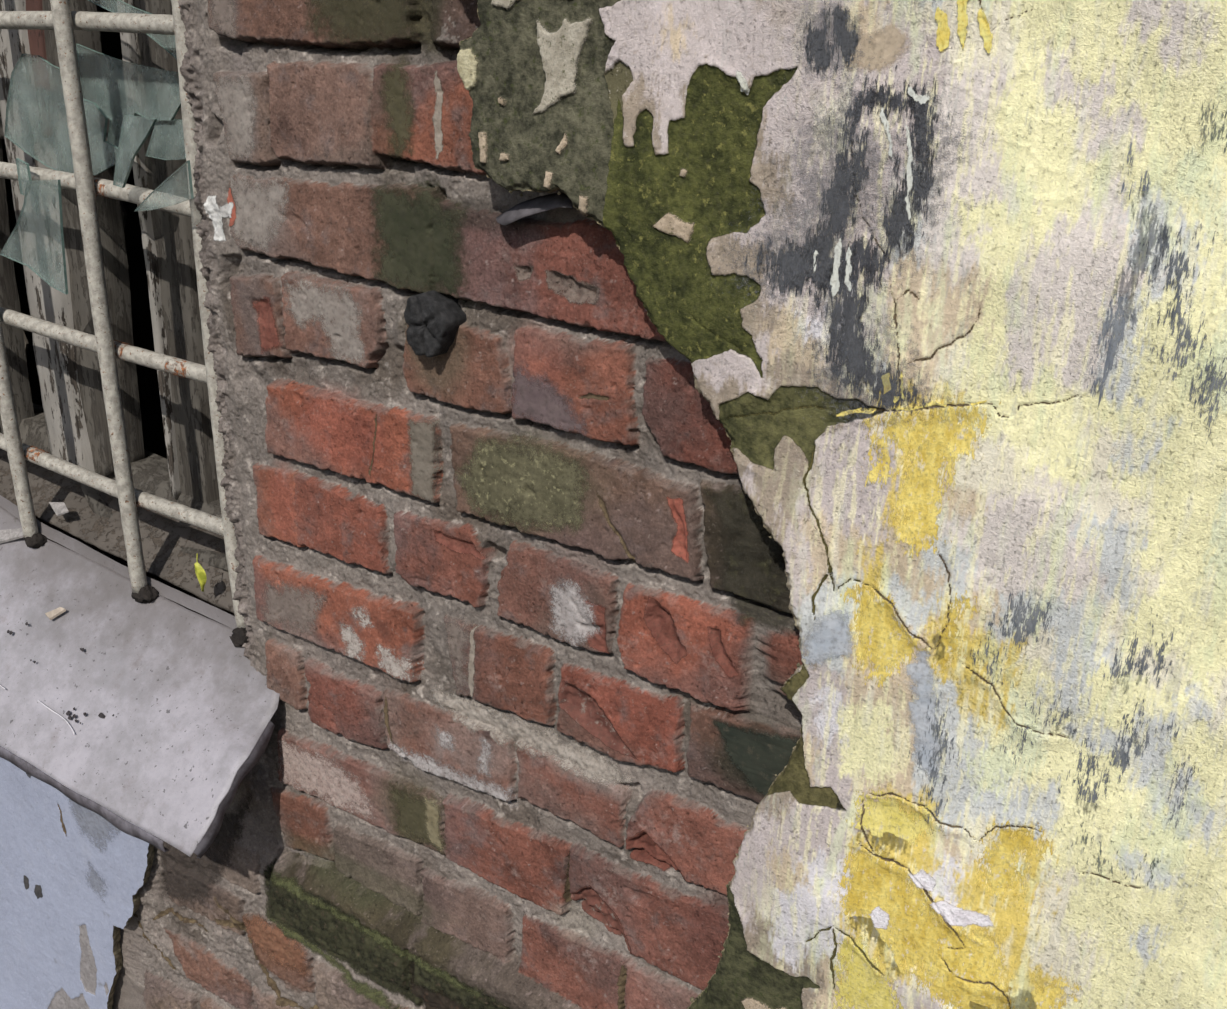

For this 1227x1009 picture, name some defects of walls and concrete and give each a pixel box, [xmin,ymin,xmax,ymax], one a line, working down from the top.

flaking render [457,0,797,377]
crack [729,135,1076,419]
peeling [719,386,1001,557]
crack [803,451,952,650]
flaking render [780,663,809,713]
flaking render [767,728,839,809]
crack [962,663,1068,738]
spalling [570,885,635,956]
spalling [625,830,685,880]
crack [806,926,883,988]
peeling [687,788,1082,1009]
crack [859,792,1039,1009]